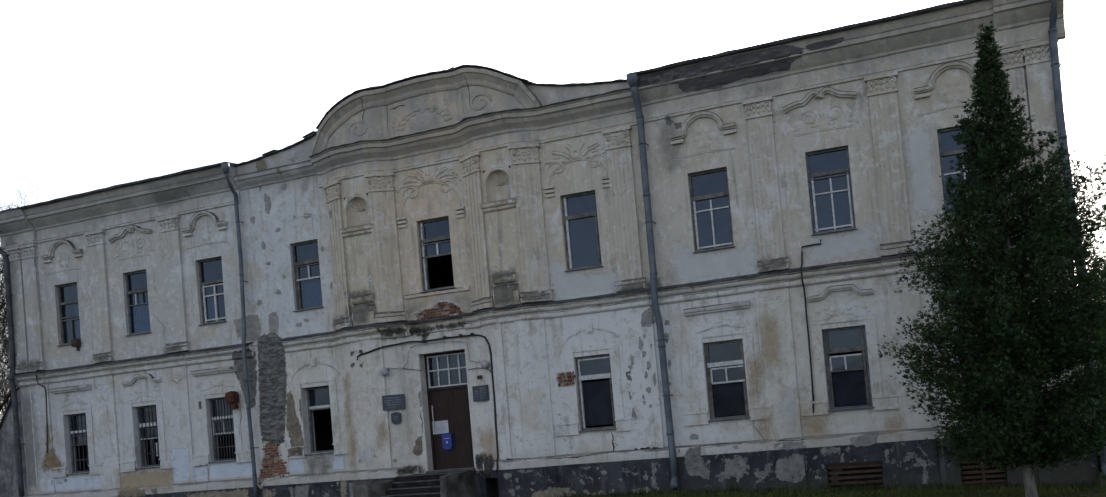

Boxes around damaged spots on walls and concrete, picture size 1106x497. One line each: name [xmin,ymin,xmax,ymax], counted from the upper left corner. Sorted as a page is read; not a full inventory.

flaking render [256,160,287,191]
flaking render [250,186,271,224]
spalling [413,300,465,324]
flaking render [229,300,279,408]
spalling [556,371,576,387]
spalling [187,391,314,497]
peeling [684,434,930,485]
peeling [503,462,659,497]